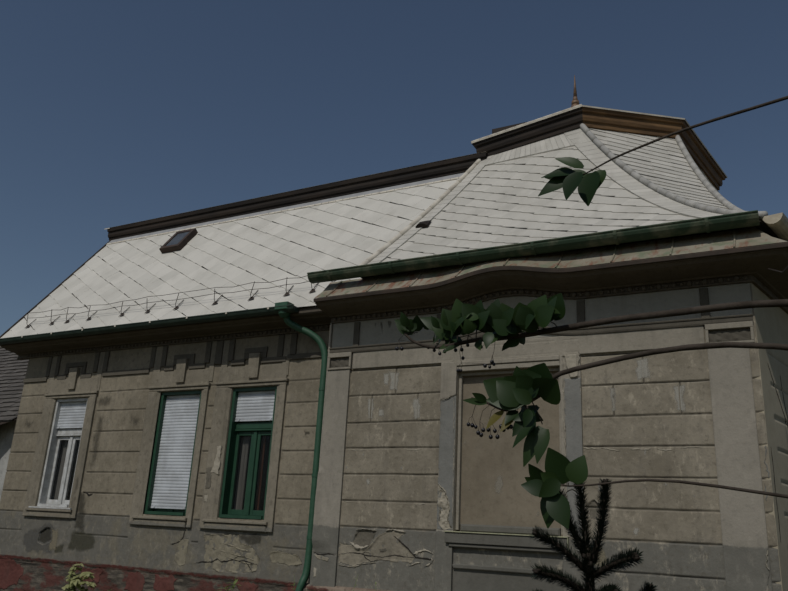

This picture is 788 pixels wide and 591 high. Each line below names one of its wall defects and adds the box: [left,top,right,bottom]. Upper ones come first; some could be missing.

peeling [562,349,583,462]
flaking render [204,446,222,502]
flaking render [437,484,452,530]
peeling [567,481,600,535]
leakage [0,494,294,585]
crack [194,556,257,571]
flaking render [204,534,260,573]
peeling [313,528,433,577]